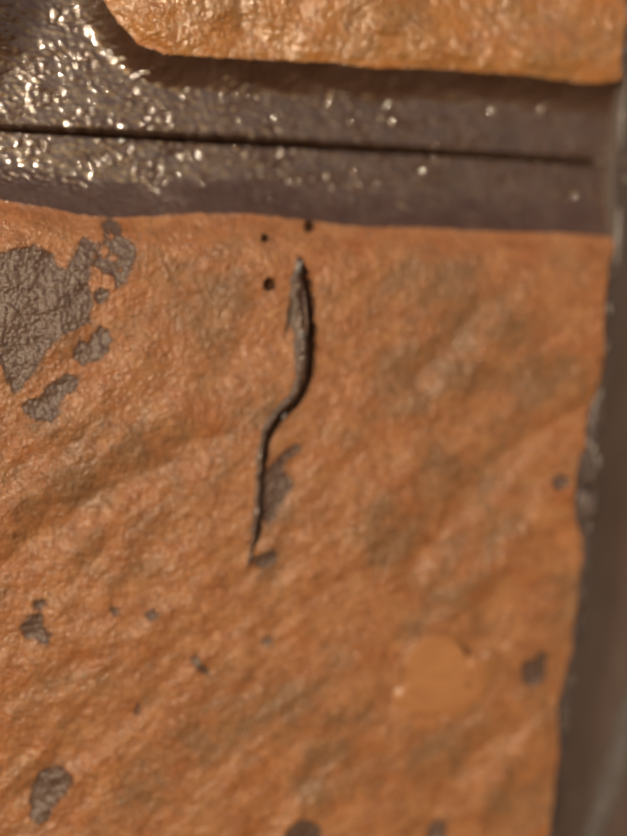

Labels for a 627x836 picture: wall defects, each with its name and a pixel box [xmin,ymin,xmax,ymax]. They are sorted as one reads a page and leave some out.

peeling [0,216,136,394]
peeling [22,374,79,423]
crack [248,258,319,569]
peeling [20,599,51,644]
peeling [521,652,548,686]
peeling [29,766,73,825]
peeling [285,820,321,836]